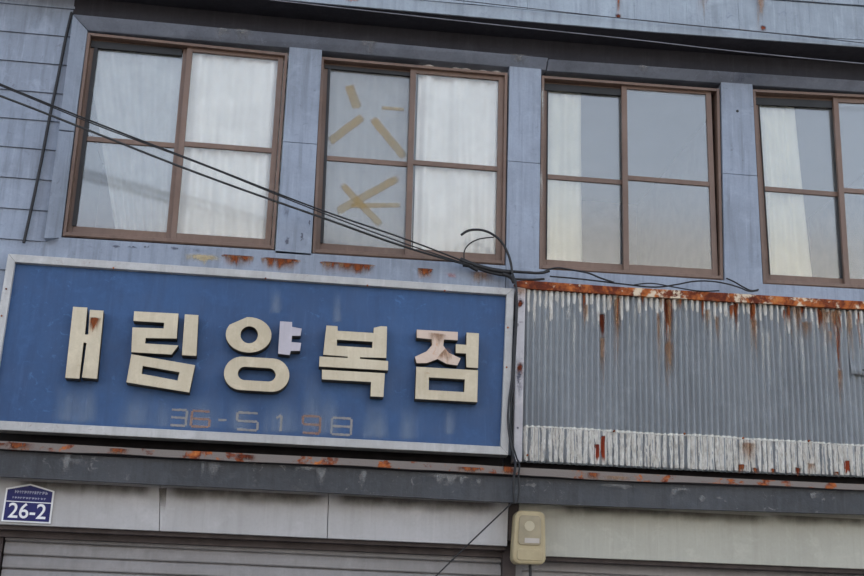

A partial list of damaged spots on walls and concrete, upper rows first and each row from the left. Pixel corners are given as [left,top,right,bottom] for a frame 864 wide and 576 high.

rust [222,254,300,268]
rust [320,261,374,272]
rust [659,298,682,363]
rust [783,306,860,360]
rust [594,436,605,459]